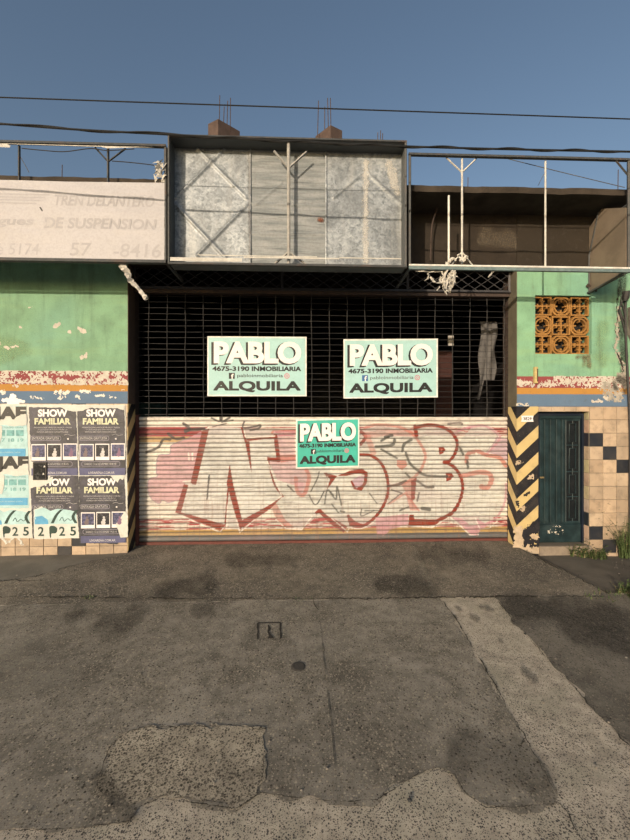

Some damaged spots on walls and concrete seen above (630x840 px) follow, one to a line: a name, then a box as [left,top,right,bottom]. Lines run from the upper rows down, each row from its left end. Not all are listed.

peeling [517,306,630,403]
peeling [0,370,128,400]
peeling [513,521,540,554]